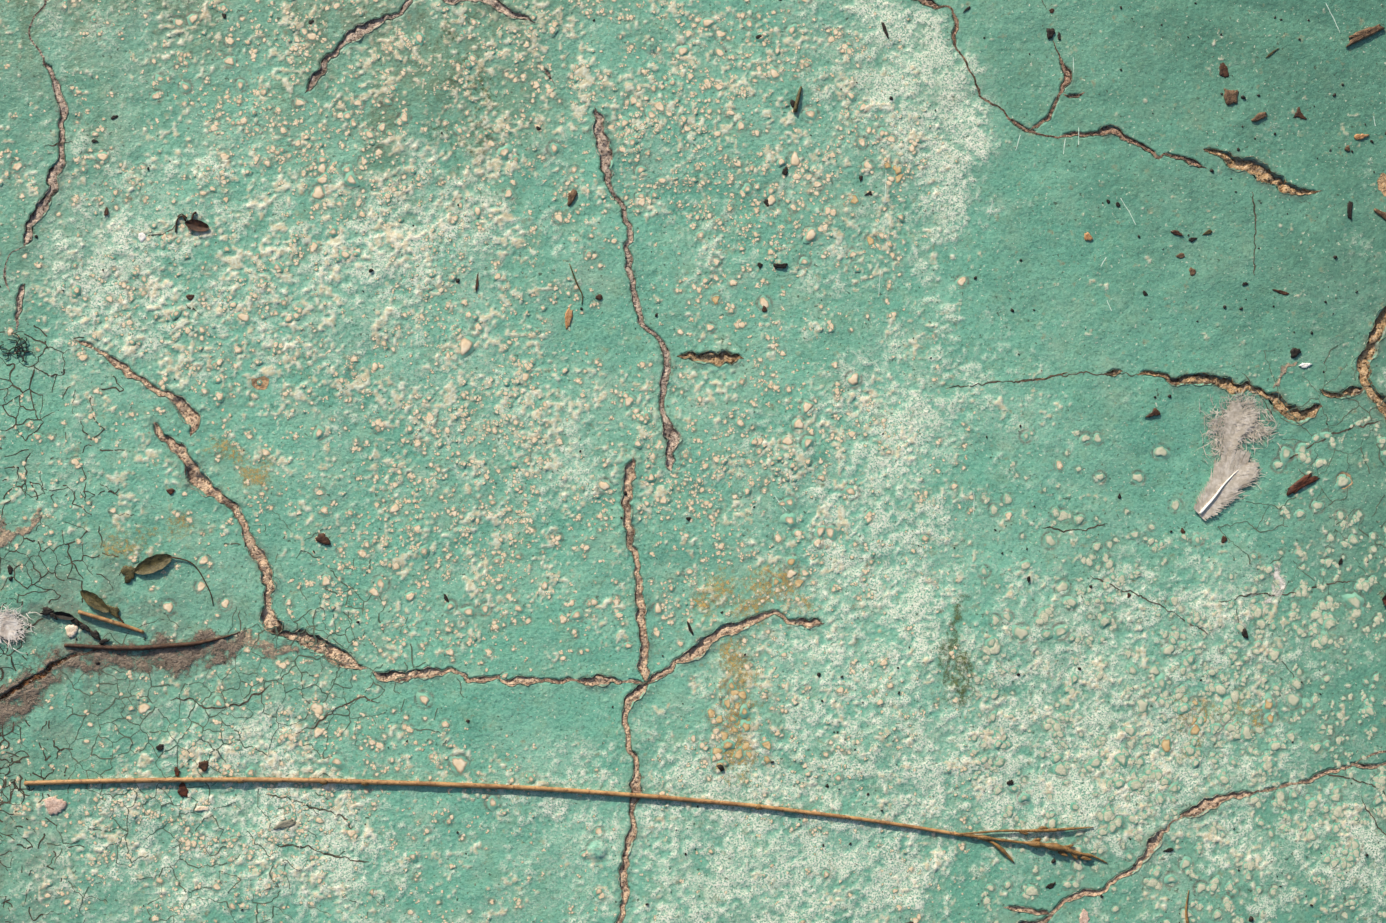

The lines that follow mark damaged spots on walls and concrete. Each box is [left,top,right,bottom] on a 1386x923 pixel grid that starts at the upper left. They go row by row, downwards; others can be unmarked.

crack [913,0,1322,275]
crack [0,0,824,923]
crack [1004,750,1386,923]